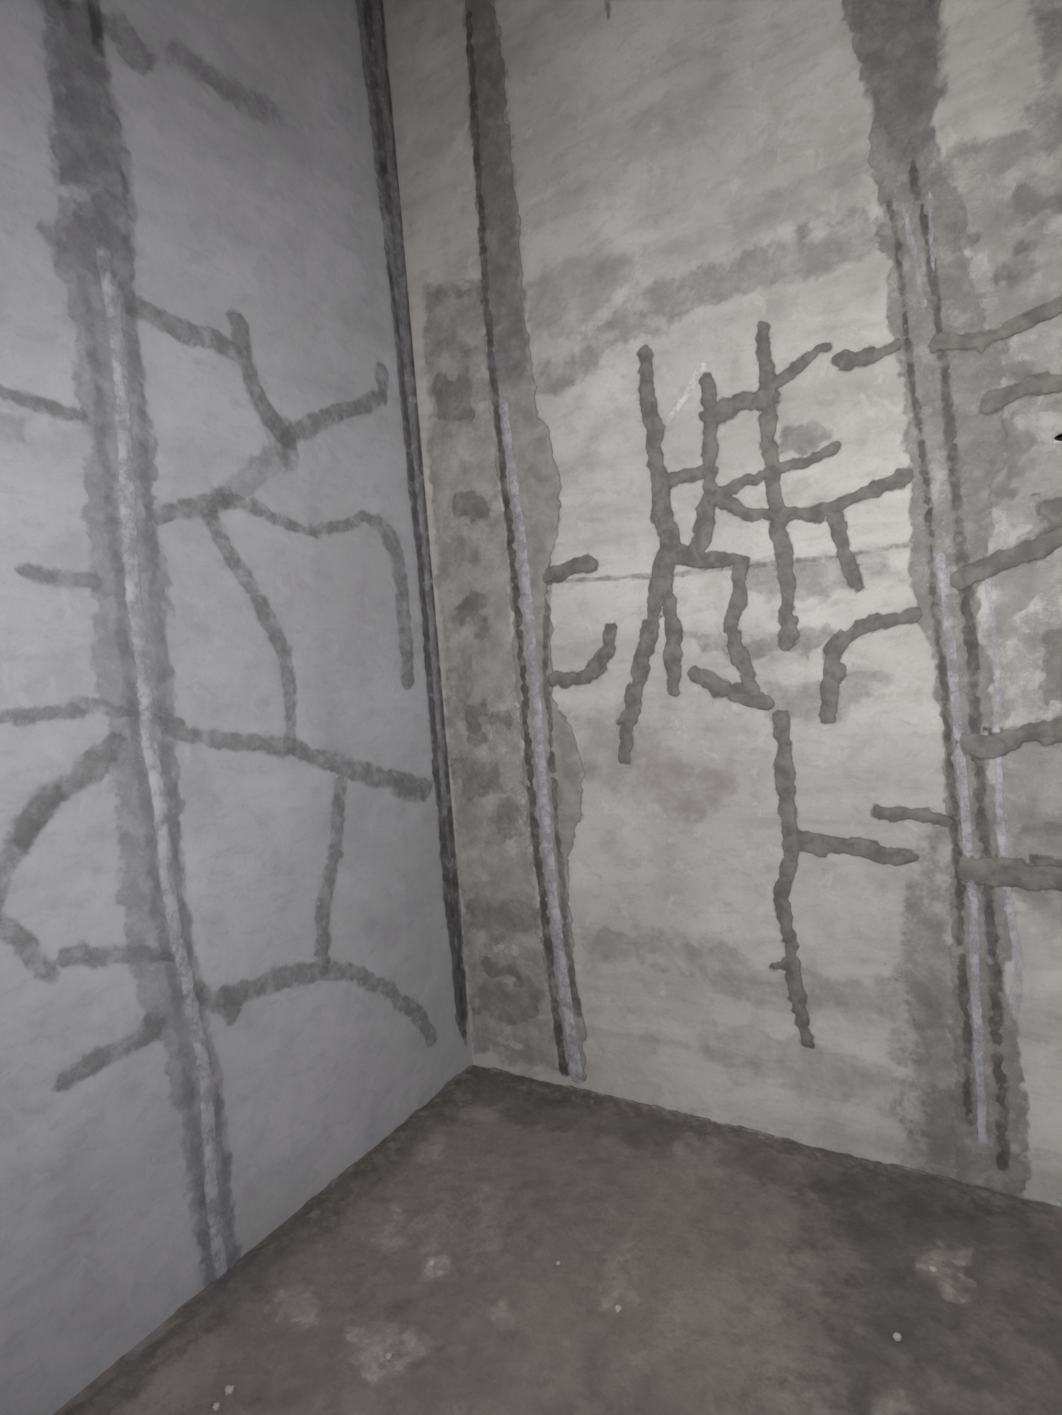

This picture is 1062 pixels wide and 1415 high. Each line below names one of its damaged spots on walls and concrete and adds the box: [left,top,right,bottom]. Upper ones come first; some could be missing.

peeling [971,135,1062,322]
crack [0,387,86,419]
crack [122,298,386,445]
peeling [1004,397,1062,454]
peeling [978,467,1052,556]
crack [542,296,1062,1048]
peeling [990,561,1062,729]
crack [4,489,436,1089]